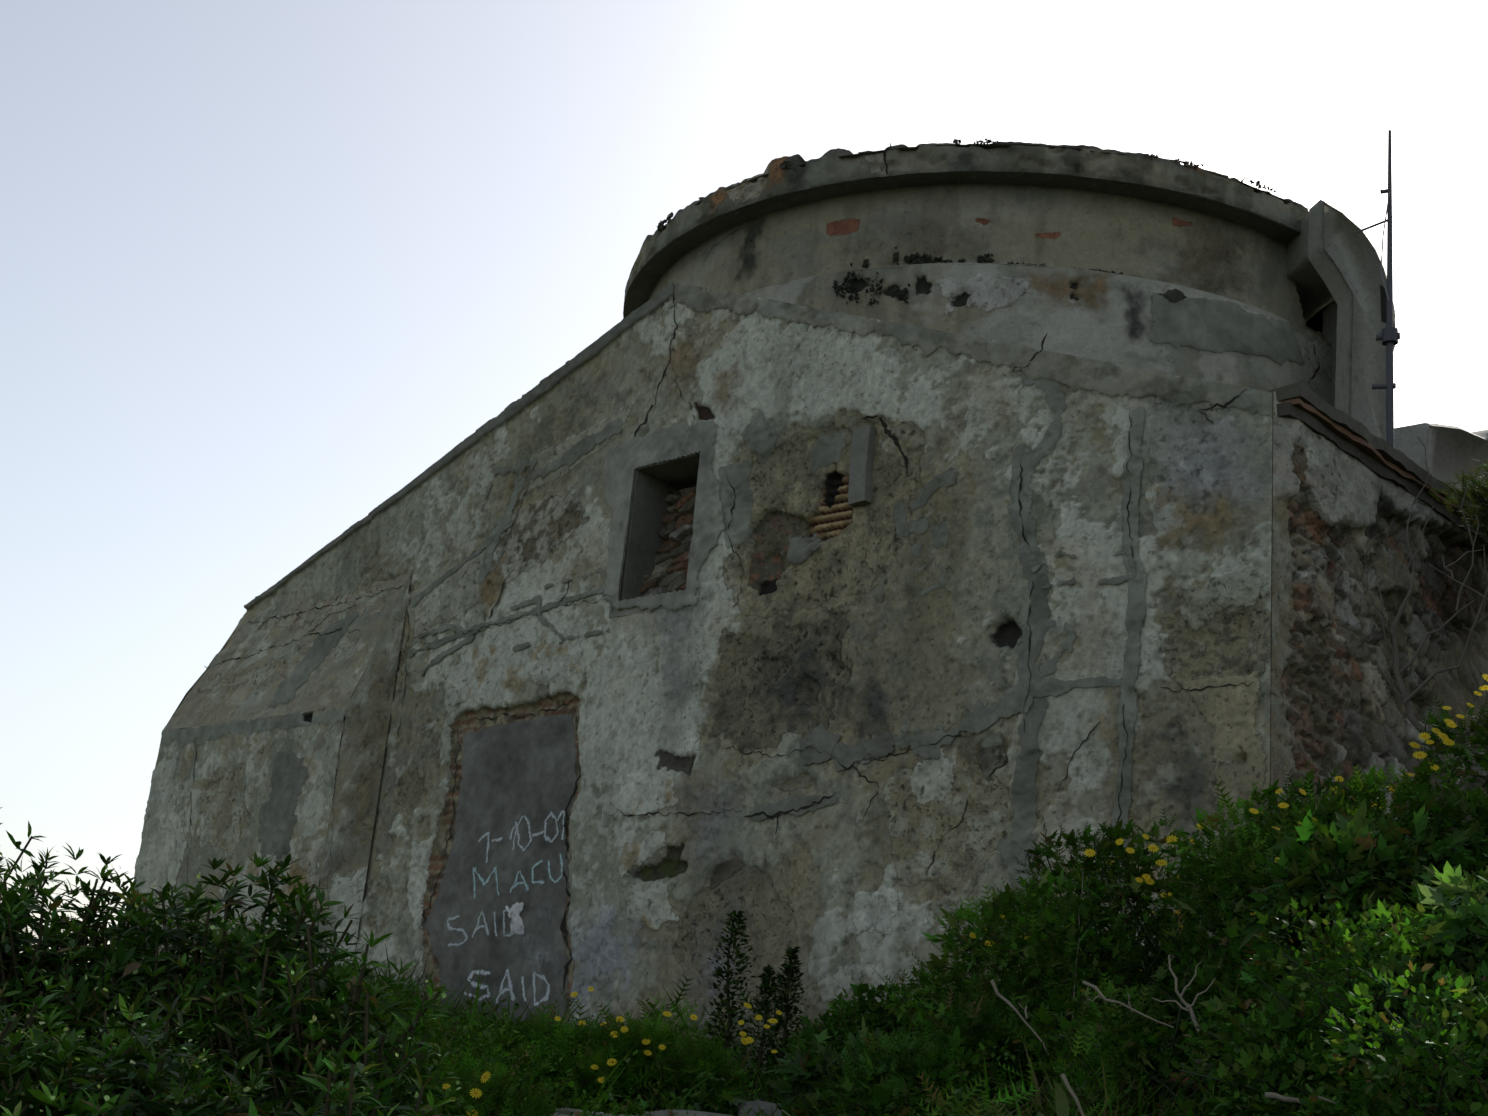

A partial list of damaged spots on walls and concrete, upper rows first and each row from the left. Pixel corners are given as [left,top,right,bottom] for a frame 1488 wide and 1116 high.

crack [630,284,695,439]
crack [1125,410,1133,559]
spalling [1292,442,1308,483]
crack [1018,463,1034,732]
peeling [1304,565,1338,629]
peeling [1370,538,1411,596]
peeling [611,415,926,1011]
crack [1058,704,1128,823]